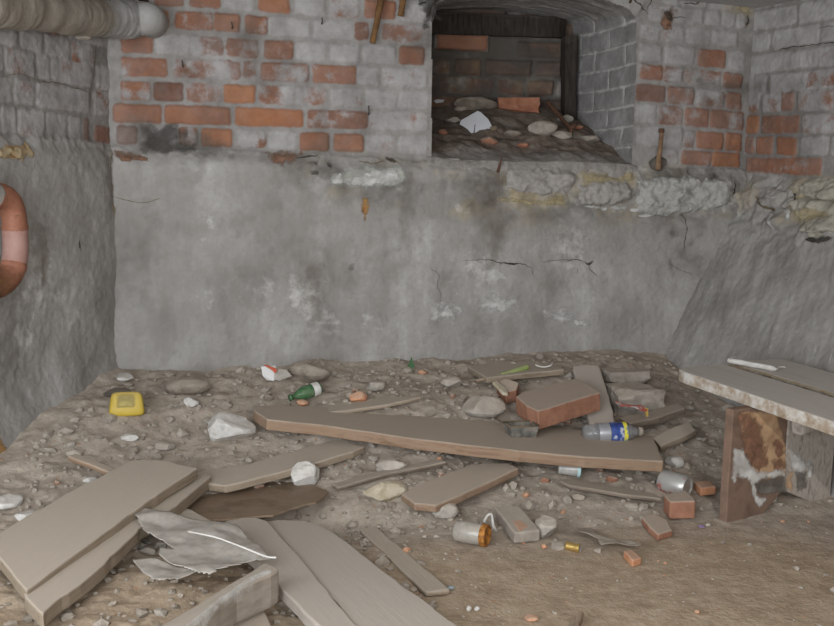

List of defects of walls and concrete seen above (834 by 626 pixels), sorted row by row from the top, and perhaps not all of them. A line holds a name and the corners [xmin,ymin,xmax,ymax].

flaking render [504,167,736,217]
flaking render [755,178,834,230]
crack [464,259,572,275]